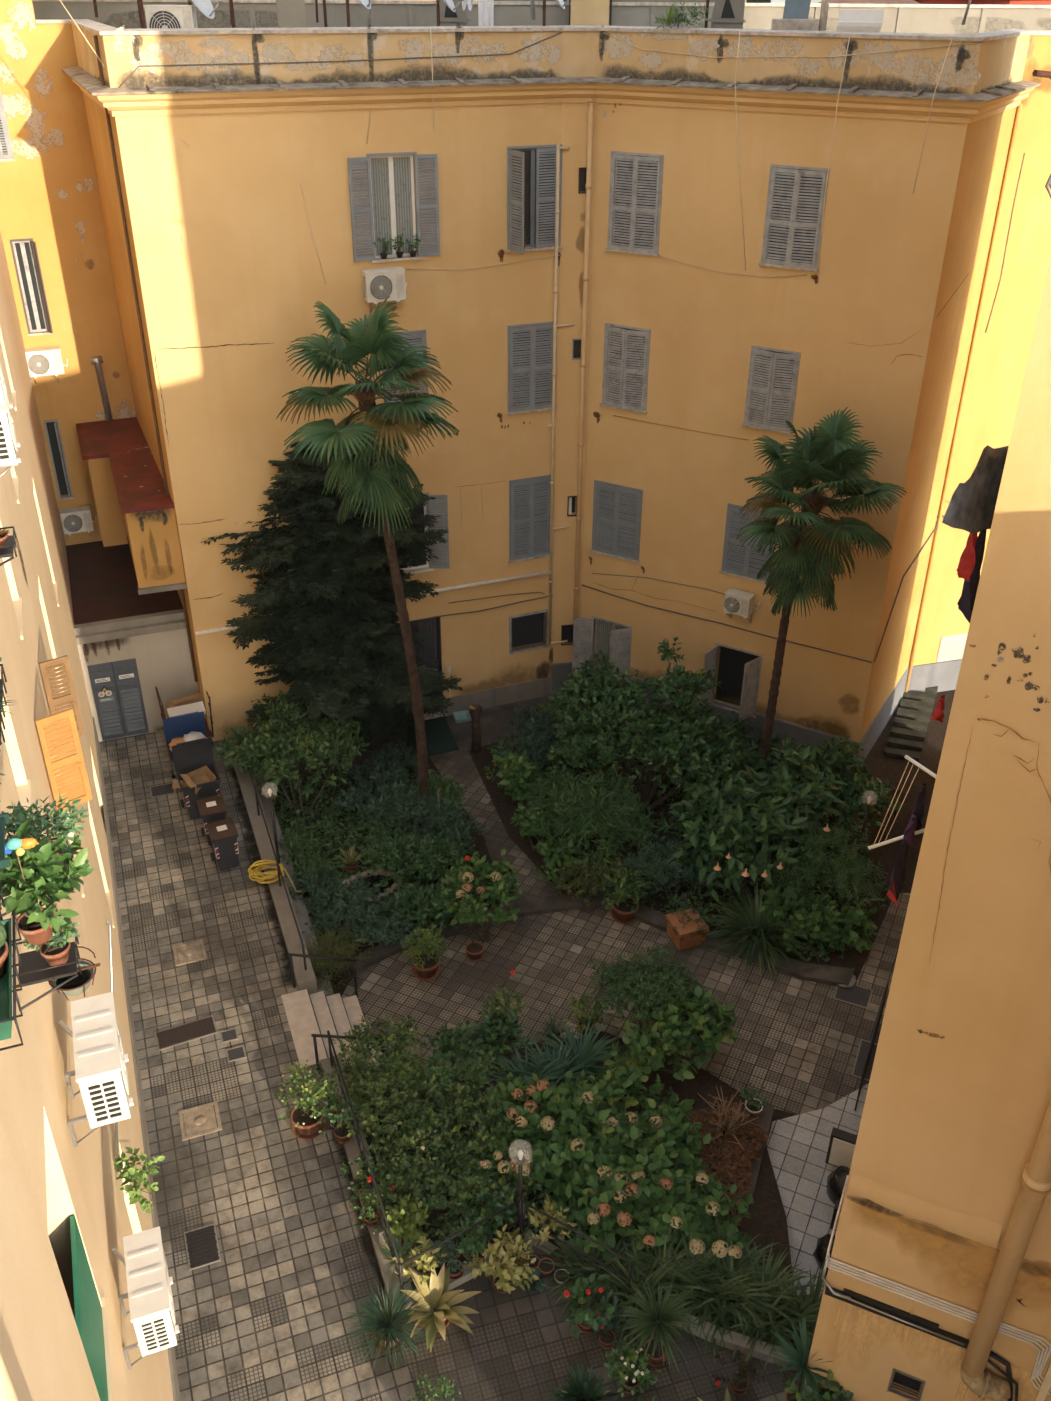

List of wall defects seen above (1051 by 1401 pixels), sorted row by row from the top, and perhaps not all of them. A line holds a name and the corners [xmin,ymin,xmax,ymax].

peeling [0,0,64,160]
peeling [112,11,368,74]
peeling [398,35,561,67]
peeling [599,18,981,92]
crack [154,343,269,446]
peeling [984,635,1049,712]
crack [929,718,1051,964]
damp [860,1203,998,1284]